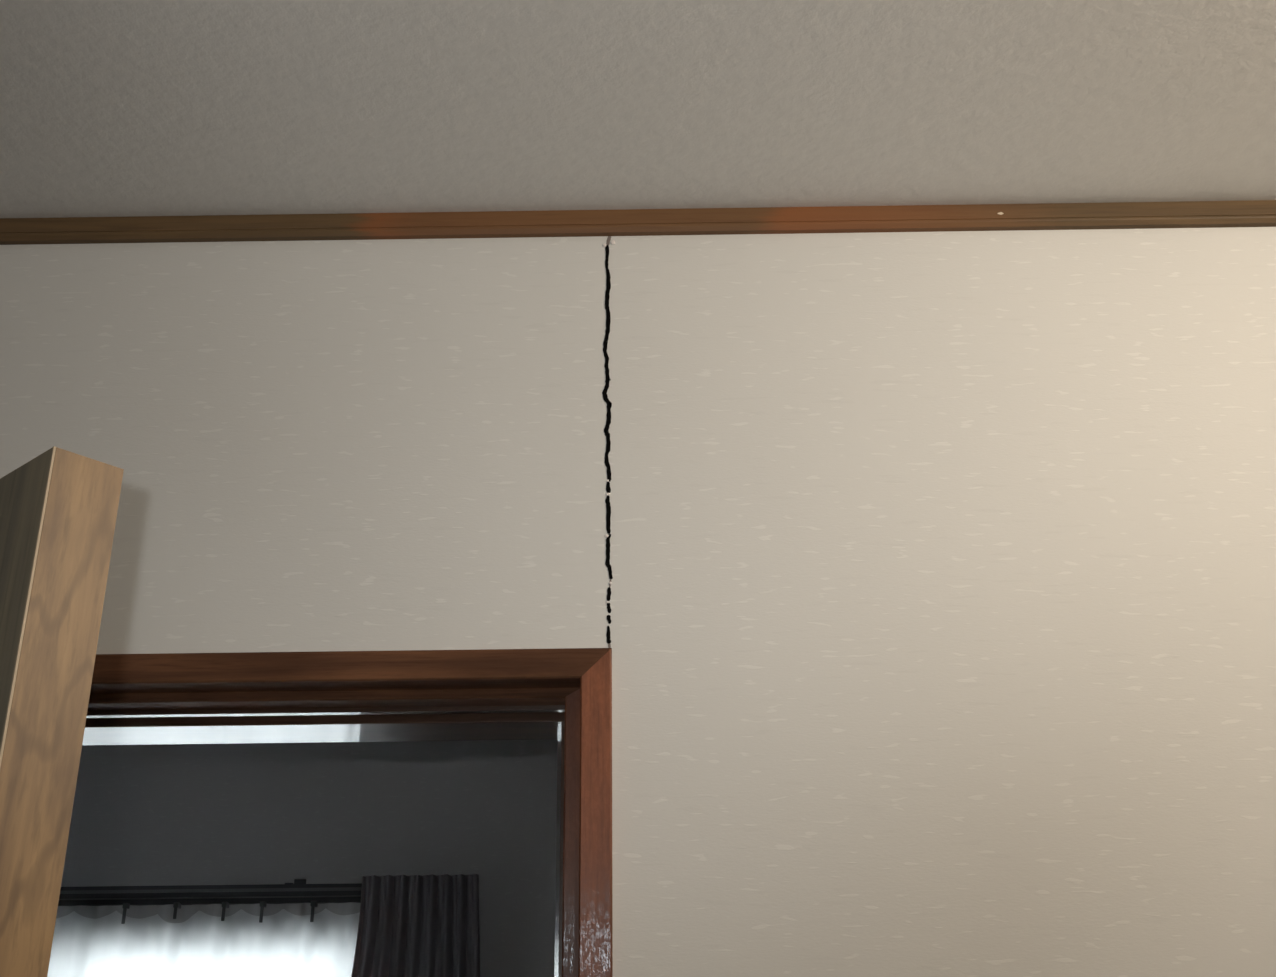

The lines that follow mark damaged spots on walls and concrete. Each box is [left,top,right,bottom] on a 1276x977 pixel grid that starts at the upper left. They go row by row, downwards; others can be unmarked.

crack [602,236,615,648]